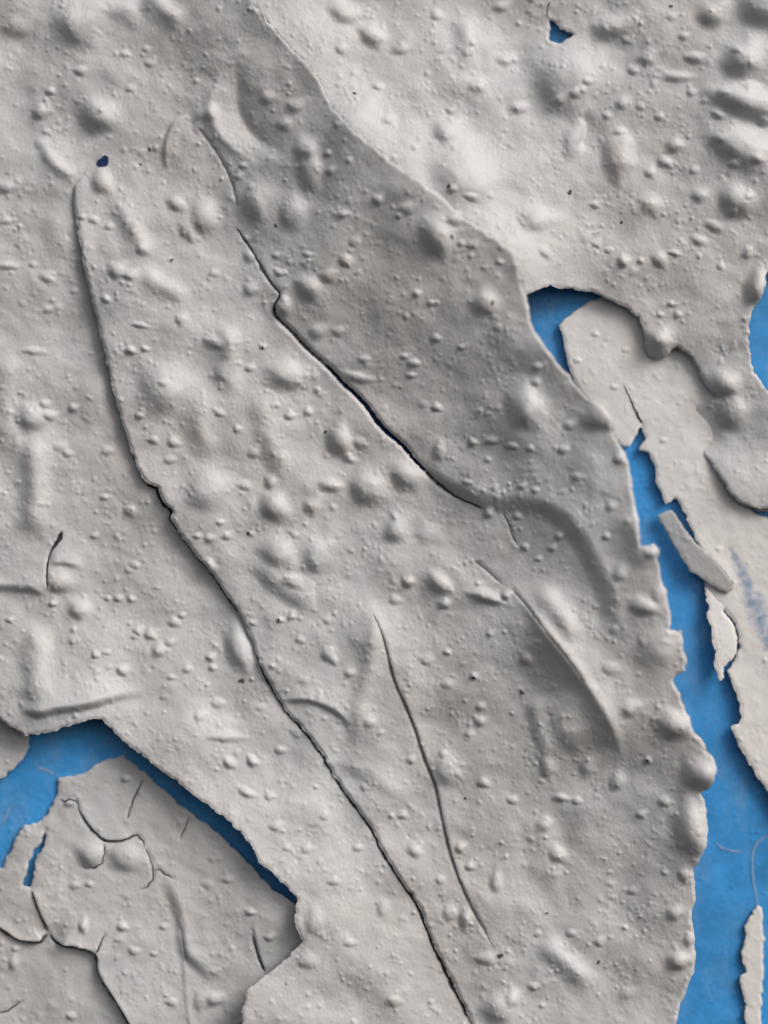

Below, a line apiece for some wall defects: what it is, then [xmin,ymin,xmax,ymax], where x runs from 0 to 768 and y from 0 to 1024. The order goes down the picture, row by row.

peeling [549,21,572,43]
crack [200,129,517,543]
crack [46,531,63,588]
crack [61,781,172,889]
peeling [0,719,302,1024]
crack [119,411,238,611]
crack [253,937,265,971]
crack [256,654,469,1018]
crack [374,616,495,948]
peeling [527,272,768,1024]